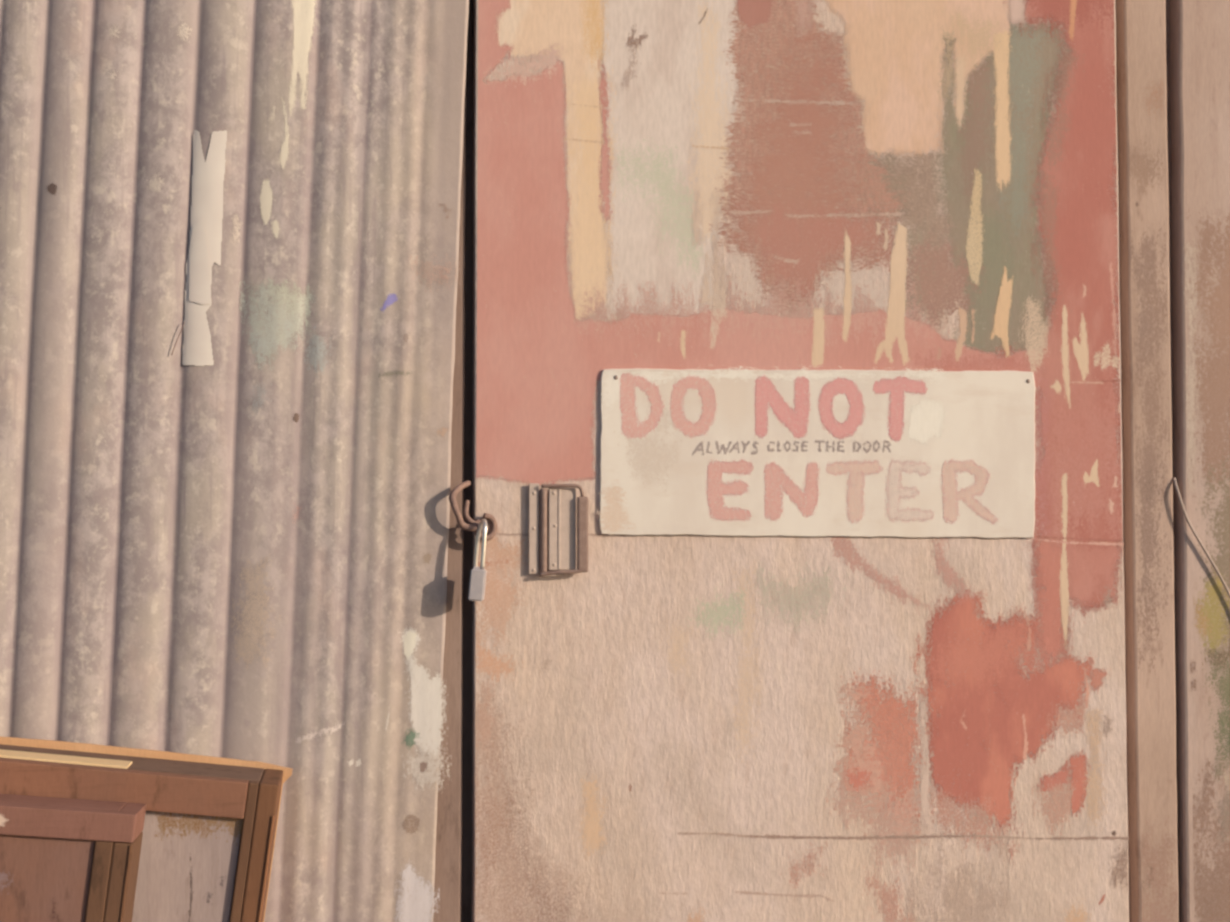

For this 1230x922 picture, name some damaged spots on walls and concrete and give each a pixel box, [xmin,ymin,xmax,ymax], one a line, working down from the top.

damp [1186,201,1230,672]